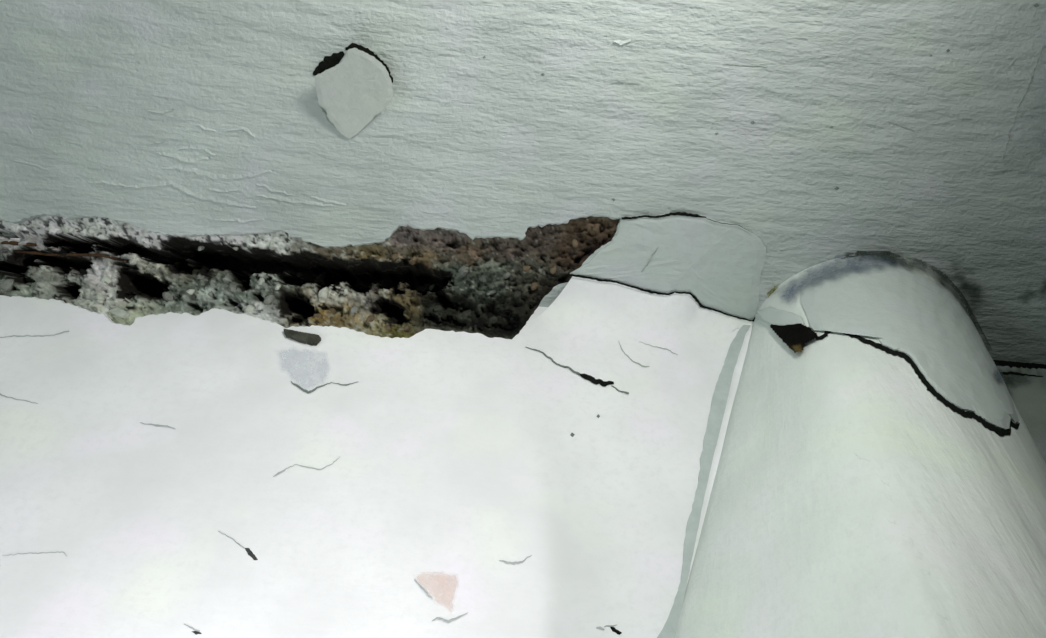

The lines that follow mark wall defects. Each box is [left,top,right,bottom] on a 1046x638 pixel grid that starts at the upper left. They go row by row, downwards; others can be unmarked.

peeling [313,43,394,139]
crack [621,212,749,231]
spalling [0,215,620,339]
crack [570,274,755,322]
crack [526,342,676,394]
crack [815,331,1020,436]
crack [1000,370,1043,378]